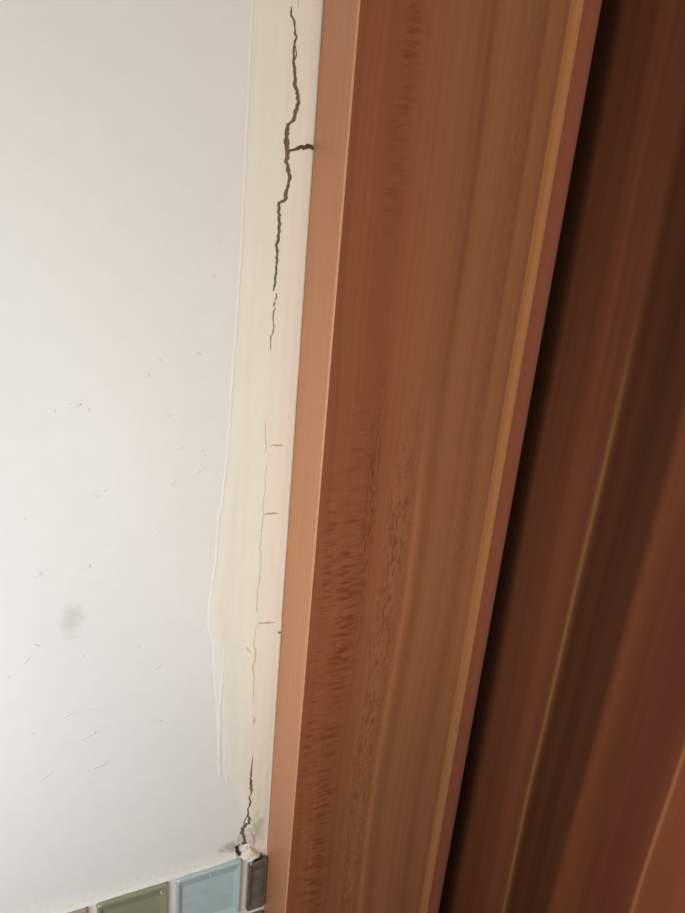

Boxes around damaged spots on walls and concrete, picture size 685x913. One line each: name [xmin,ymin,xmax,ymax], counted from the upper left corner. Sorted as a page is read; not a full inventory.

crack [270,0,314,350]
crack [246,419,283,725]
crack [240,757,253,845]
spalling [234,828,263,863]